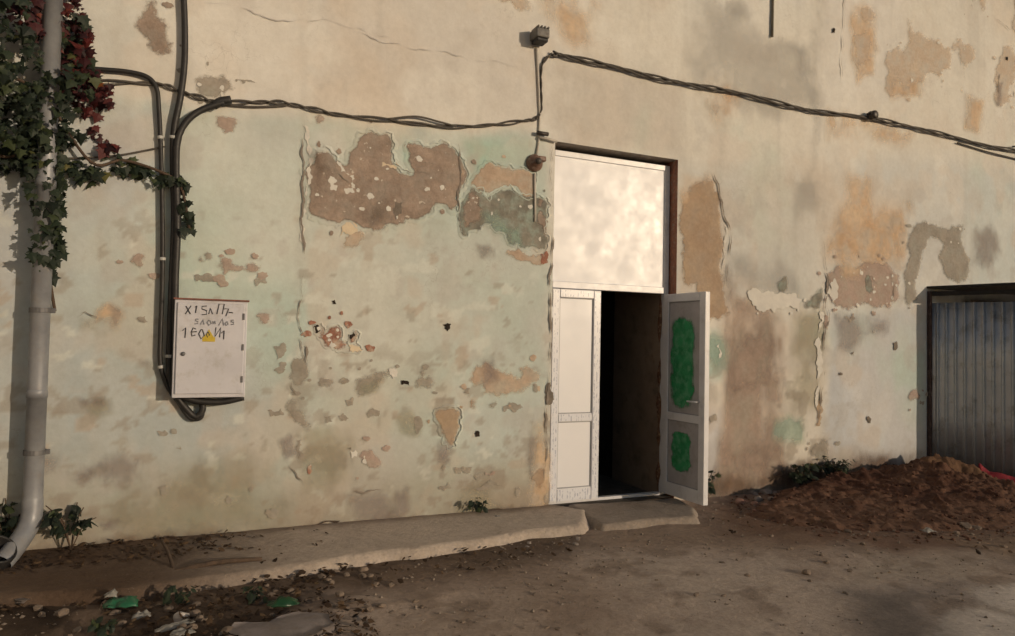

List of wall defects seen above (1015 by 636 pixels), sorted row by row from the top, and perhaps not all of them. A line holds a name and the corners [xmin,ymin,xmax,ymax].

peeling [137,2,181,54]
peeling [197,62,255,104]
peeling [852,9,876,79]
peeling [886,27,975,102]
peeling [993,46,1015,109]
flaking render [298,121,552,265]
peeling [194,248,268,287]
crack [297,122,314,365]
peeling [679,175,732,319]
flaking render [747,222,970,322]
peeling [268,311,438,425]
peeling [413,354,540,451]